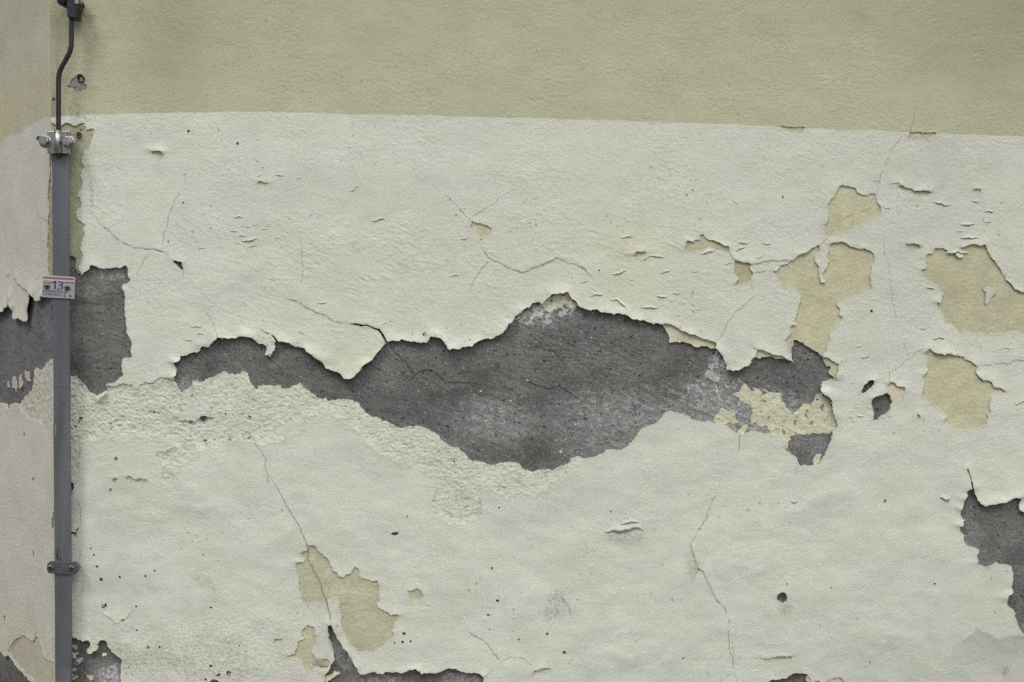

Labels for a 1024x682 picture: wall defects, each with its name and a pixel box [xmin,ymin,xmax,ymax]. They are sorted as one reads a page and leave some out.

peeling [873,180,950,206]
spalling [0,296,53,425]
crack [289,239,459,383]
spalling [52,123,891,524]
spalling [850,380,905,420]
peeling [920,328,1005,430]
peeling [906,222,1024,347]
spalling [72,637,122,682]
crack [249,432,331,621]
peeling [288,545,484,682]
spalling [960,482,1024,634]